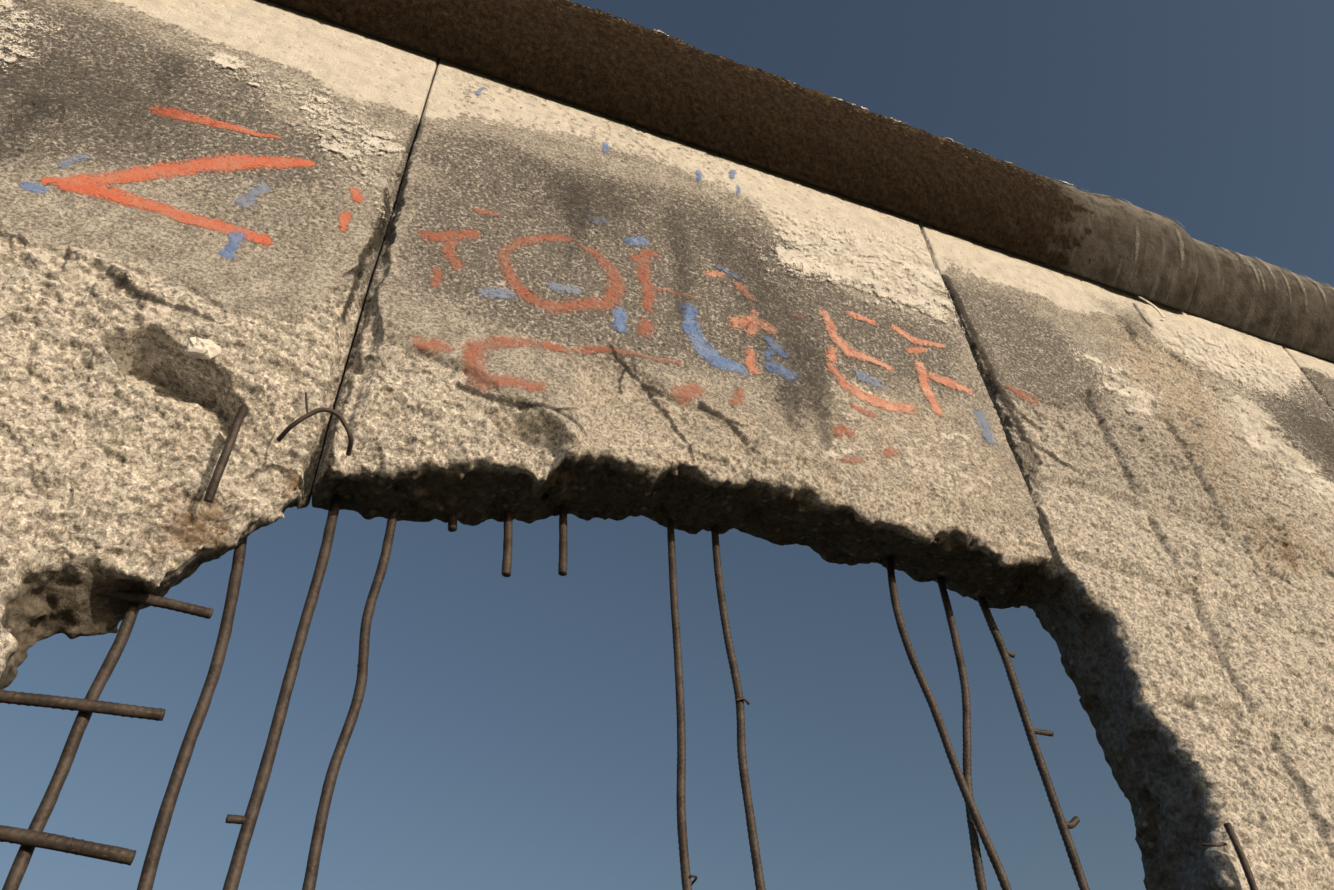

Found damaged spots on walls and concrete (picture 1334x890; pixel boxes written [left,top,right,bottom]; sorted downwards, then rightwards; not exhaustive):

rust [203,404,249,503]
spalling [0,231,1334,890]